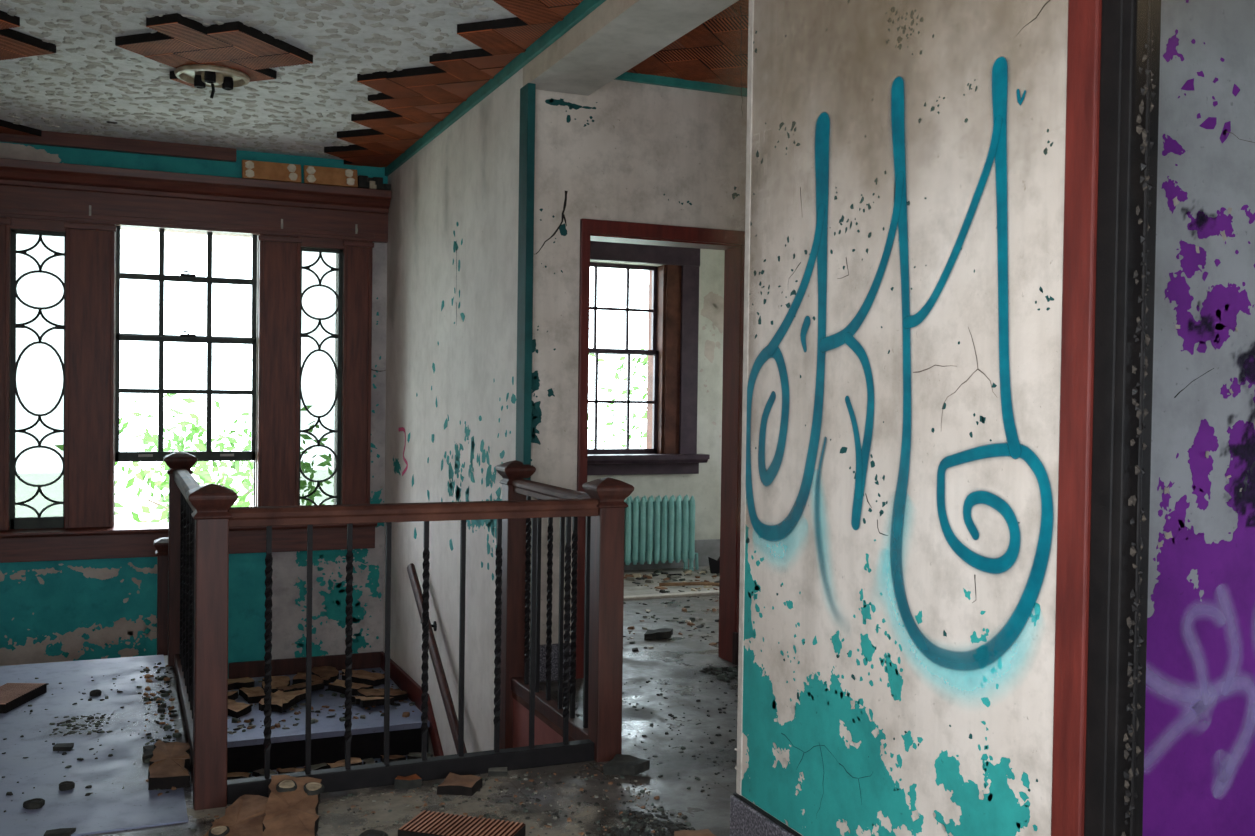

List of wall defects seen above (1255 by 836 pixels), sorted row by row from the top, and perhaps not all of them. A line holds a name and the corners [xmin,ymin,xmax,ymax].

peeling [545,98,597,127]
peeling [1178,71,1231,143]
peeling [830,170,886,260]
peeling [1162,134,1255,355]
peeling [370,363,516,504]
peeling [531,370,555,445]
damp [1225,401,1255,526]
damp [1237,342,1255,382]
peeling [0,562,157,666]
peeling [228,548,408,718]
peeling [735,525,1038,836]
peeling [1142,419,1255,836]